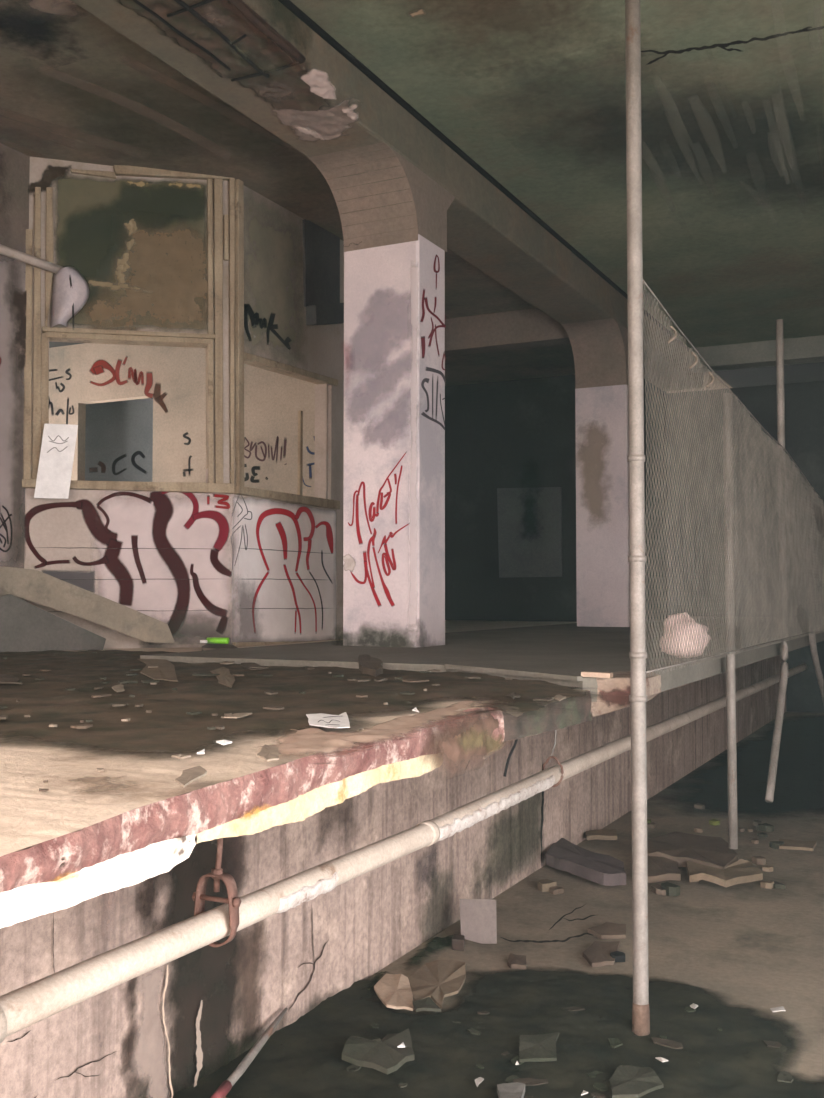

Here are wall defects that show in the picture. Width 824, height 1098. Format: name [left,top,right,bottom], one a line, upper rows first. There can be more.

crack [641,26,824,65]
leakage [568,97,626,155]
leakage [641,96,824,193]
leakage [136,836,245,932]
spalling [0,754,443,928]
leakage [122,977,151,1098]
leakage [166,923,264,1098]
crack [287,910,328,1014]